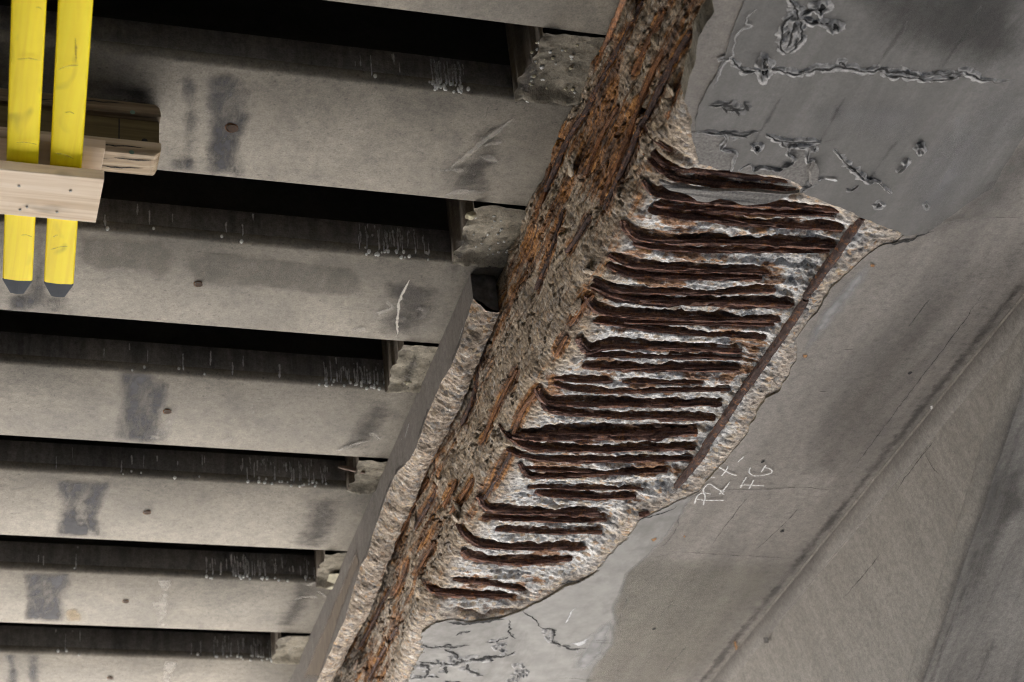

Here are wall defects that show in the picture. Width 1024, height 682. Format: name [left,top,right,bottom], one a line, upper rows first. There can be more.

crack [698,0,1015,194]
corrosion [651,141,786,188]
corrosion [628,235,770,254]
corrosion [652,191,808,230]
spalling [333,0,902,682]
corrosion [547,255,771,422]
corrosion [465,438,666,567]
corrosion [439,582,517,598]
crack [409,610,611,682]